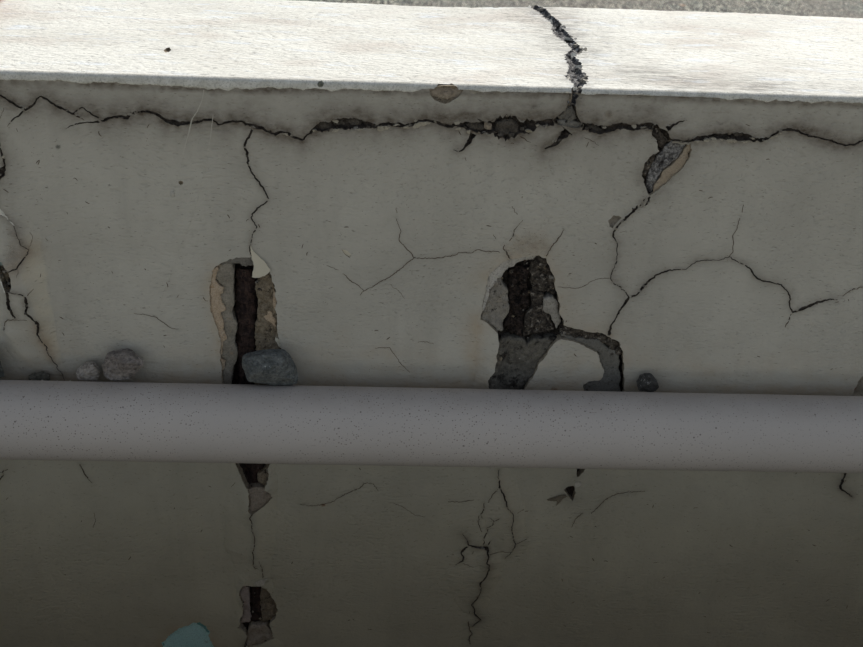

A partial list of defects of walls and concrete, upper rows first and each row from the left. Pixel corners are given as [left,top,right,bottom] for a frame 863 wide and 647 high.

crack [0,5,863,254]
spalling [642,124,692,195]
spalling [0,262,11,293]
crack [1,215,64,379]
spalling [209,245,281,385]
crack [327,207,523,299]
spalling [480,255,625,392]
crack [562,196,863,336]
peeling [162,622,214,647]
spalling [235,463,272,514]
spalling [238,586,278,647]
crack [448,471,526,642]